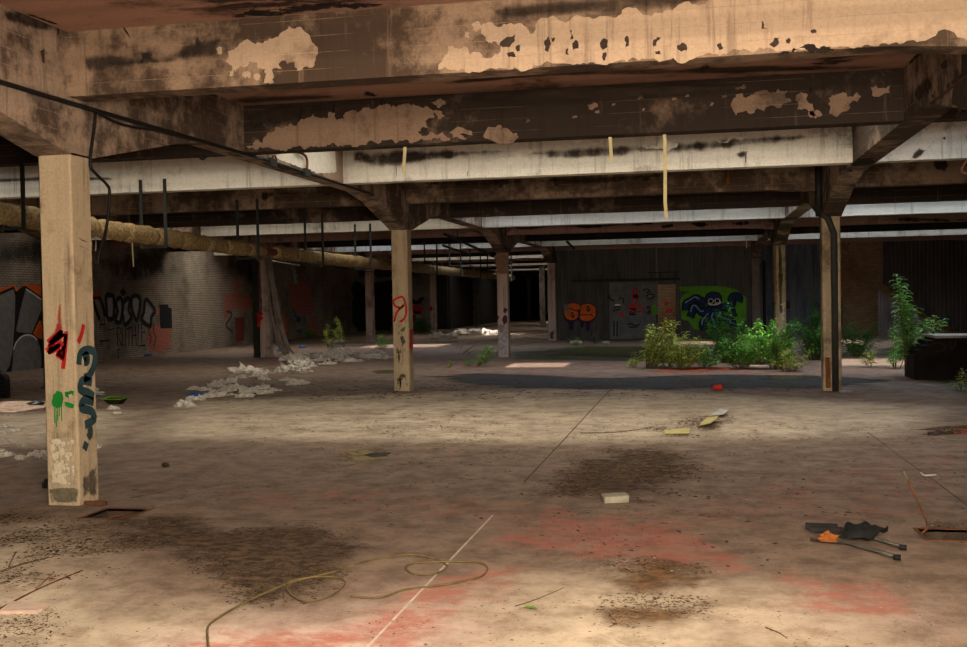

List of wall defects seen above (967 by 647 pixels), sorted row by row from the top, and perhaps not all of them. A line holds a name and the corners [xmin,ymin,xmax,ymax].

peeling [216,26,318,84]
damp [199,0,383,18]
damp [497,0,697,17]
peeling [438,0,967,74]
peeling [710,84,890,118]
peeling [229,98,533,176]